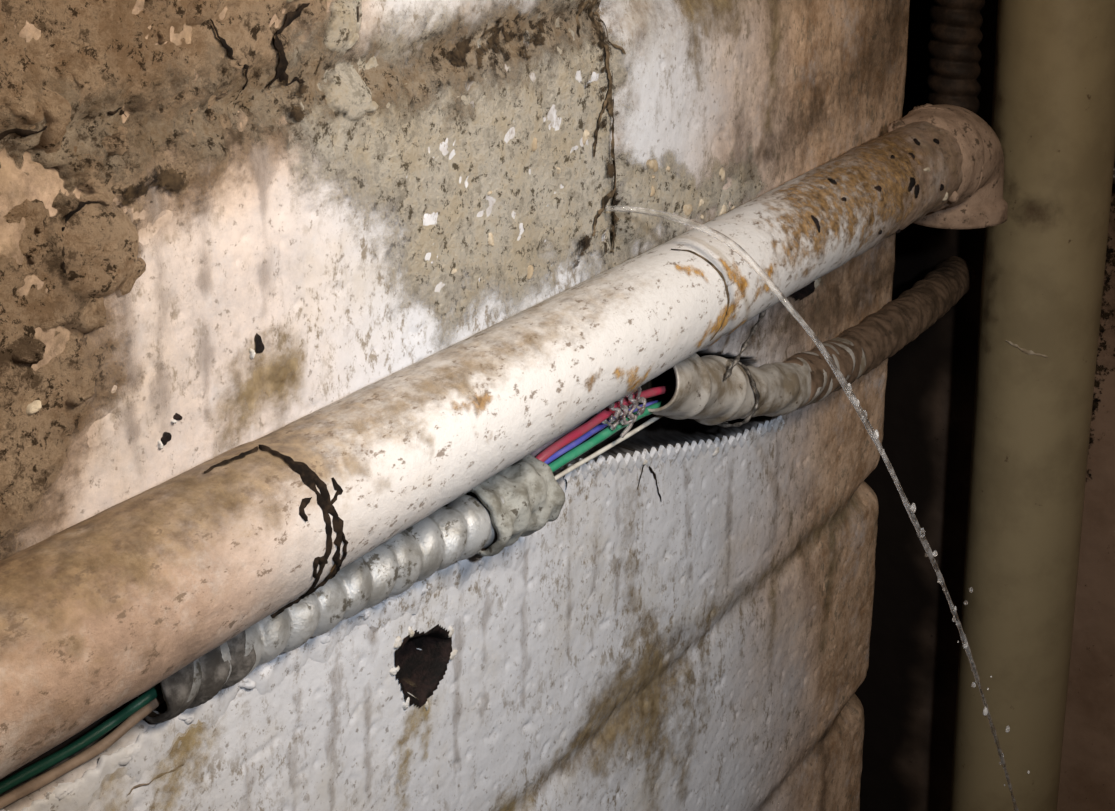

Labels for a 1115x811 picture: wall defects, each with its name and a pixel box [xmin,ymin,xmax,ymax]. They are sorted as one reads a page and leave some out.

crack [210,3,310,90]
crack [576,0,626,244]
spalling [0,0,785,561]
damp [1088,183,1115,453]
peeling [0,532,537,811]
damp [555,624,690,792]